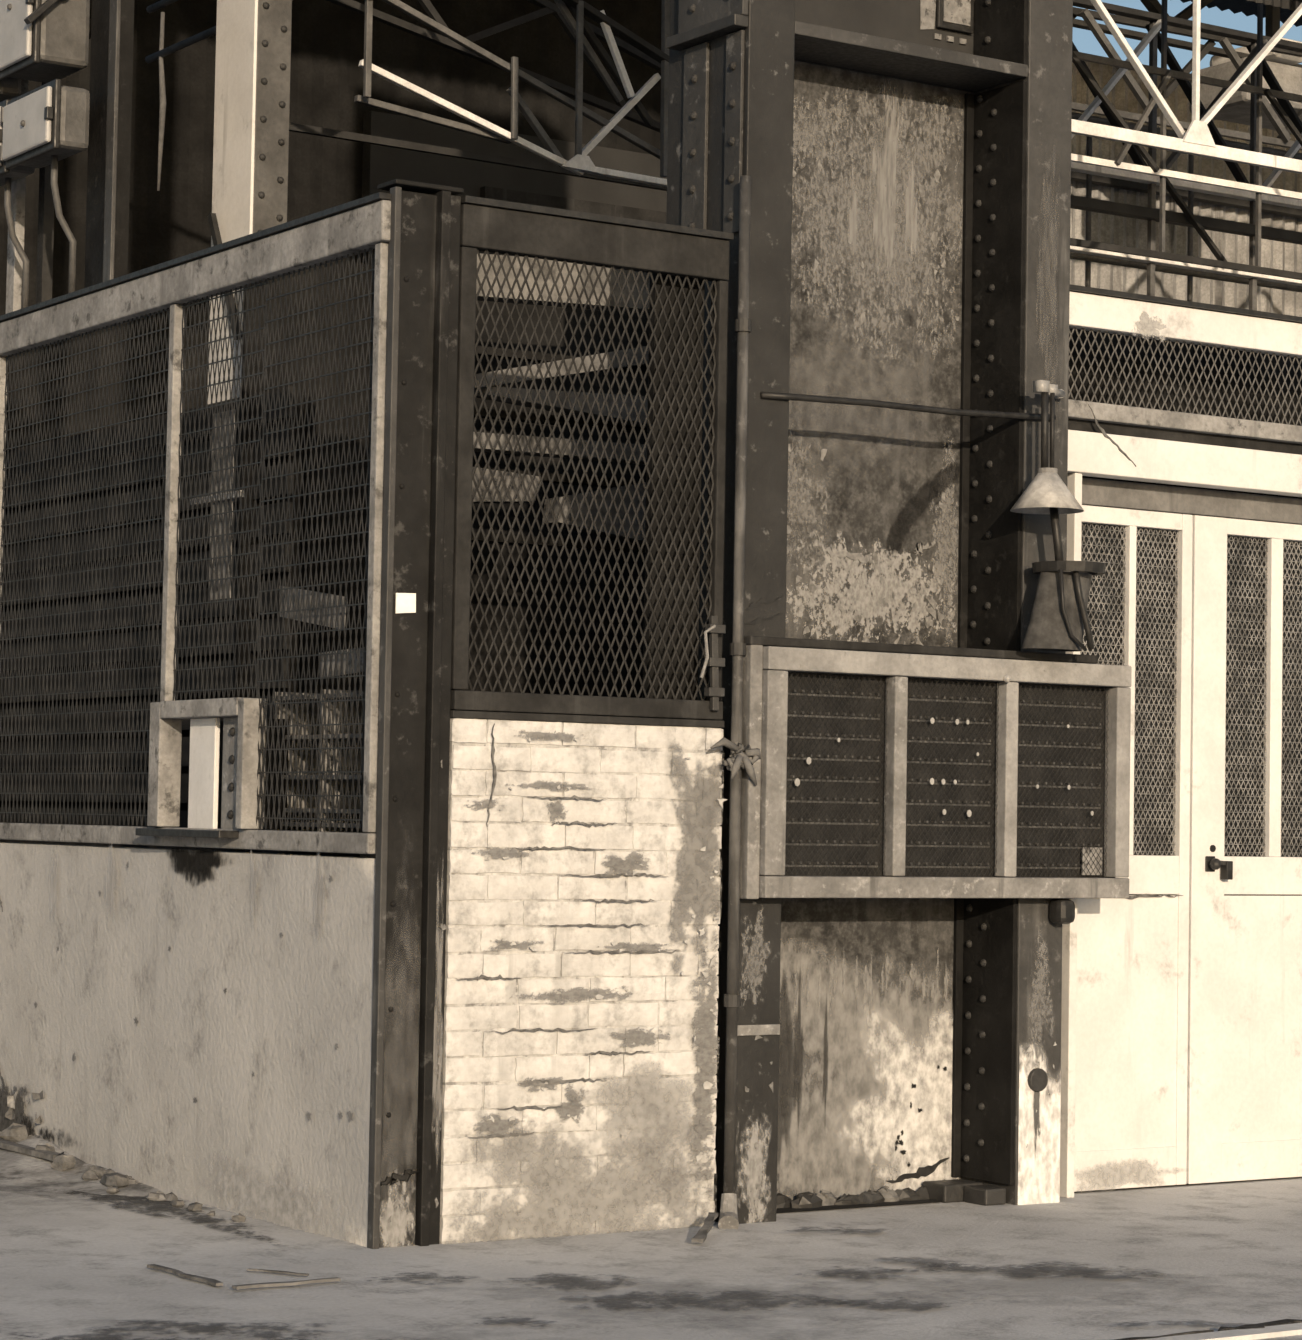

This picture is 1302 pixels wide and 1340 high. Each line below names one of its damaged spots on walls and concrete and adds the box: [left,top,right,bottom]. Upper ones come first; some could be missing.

leakage [170,847,220,885]
leakage [452,1064,706,1244]
rust [776,1157,949,1209]